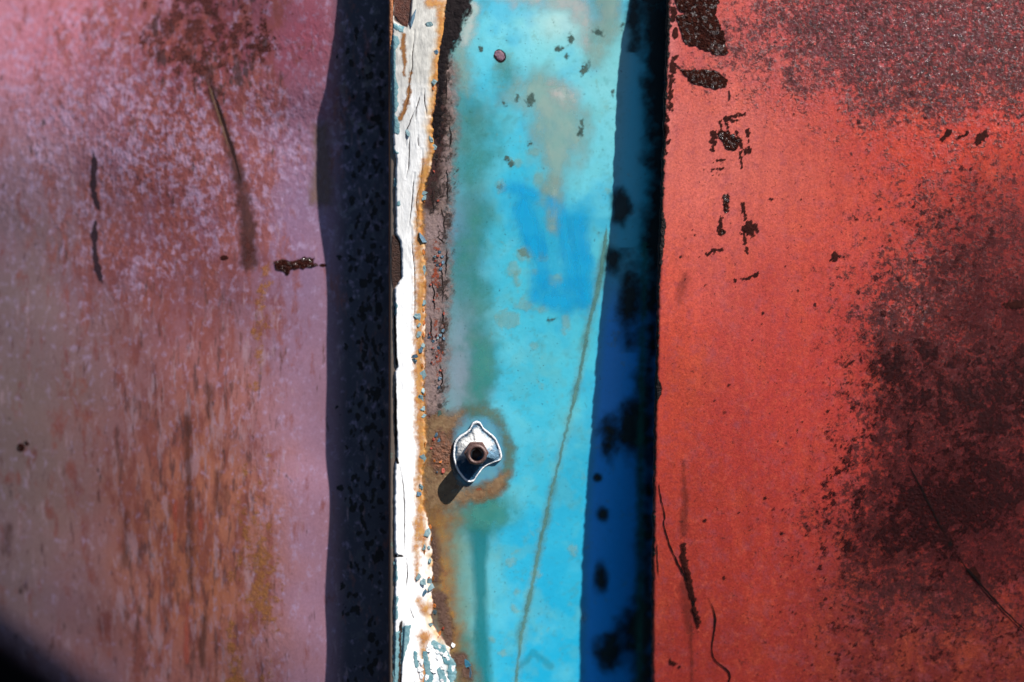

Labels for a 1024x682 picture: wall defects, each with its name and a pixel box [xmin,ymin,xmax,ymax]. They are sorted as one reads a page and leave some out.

peeling [391,0,433,154]
peeling [670,0,729,55]
peeling [676,64,731,100]
corrosion [139,0,287,391]
peeling [391,235,402,287]
peeling [709,112,752,175]
peeling [705,194,759,256]
peeling [411,300,427,417]
corrosion [413,0,515,682]
corrosion [229,482,284,633]
peeling [393,561,472,682]
crack [656,485,731,682]